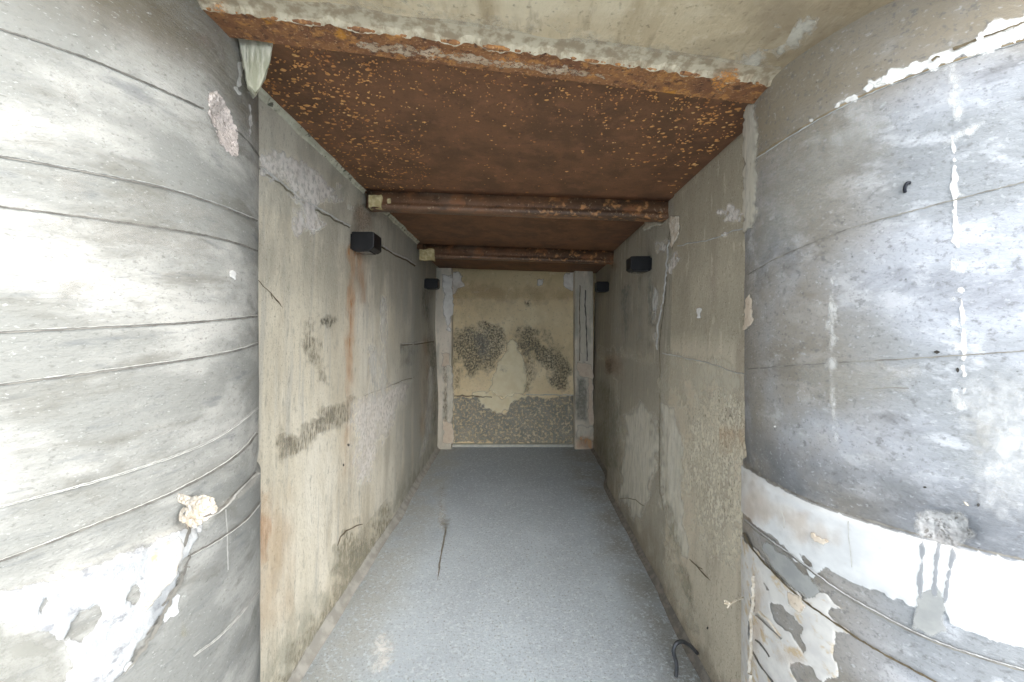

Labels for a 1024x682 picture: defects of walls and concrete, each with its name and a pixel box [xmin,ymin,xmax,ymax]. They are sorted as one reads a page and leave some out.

spalling [208,91,239,157]
corrosion [264,43,745,193]
damp [276,347,406,479]
damp [424,321,586,447]
peeling [0,494,218,682]
crack [438,527,447,576]
peeling [741,465,1024,682]